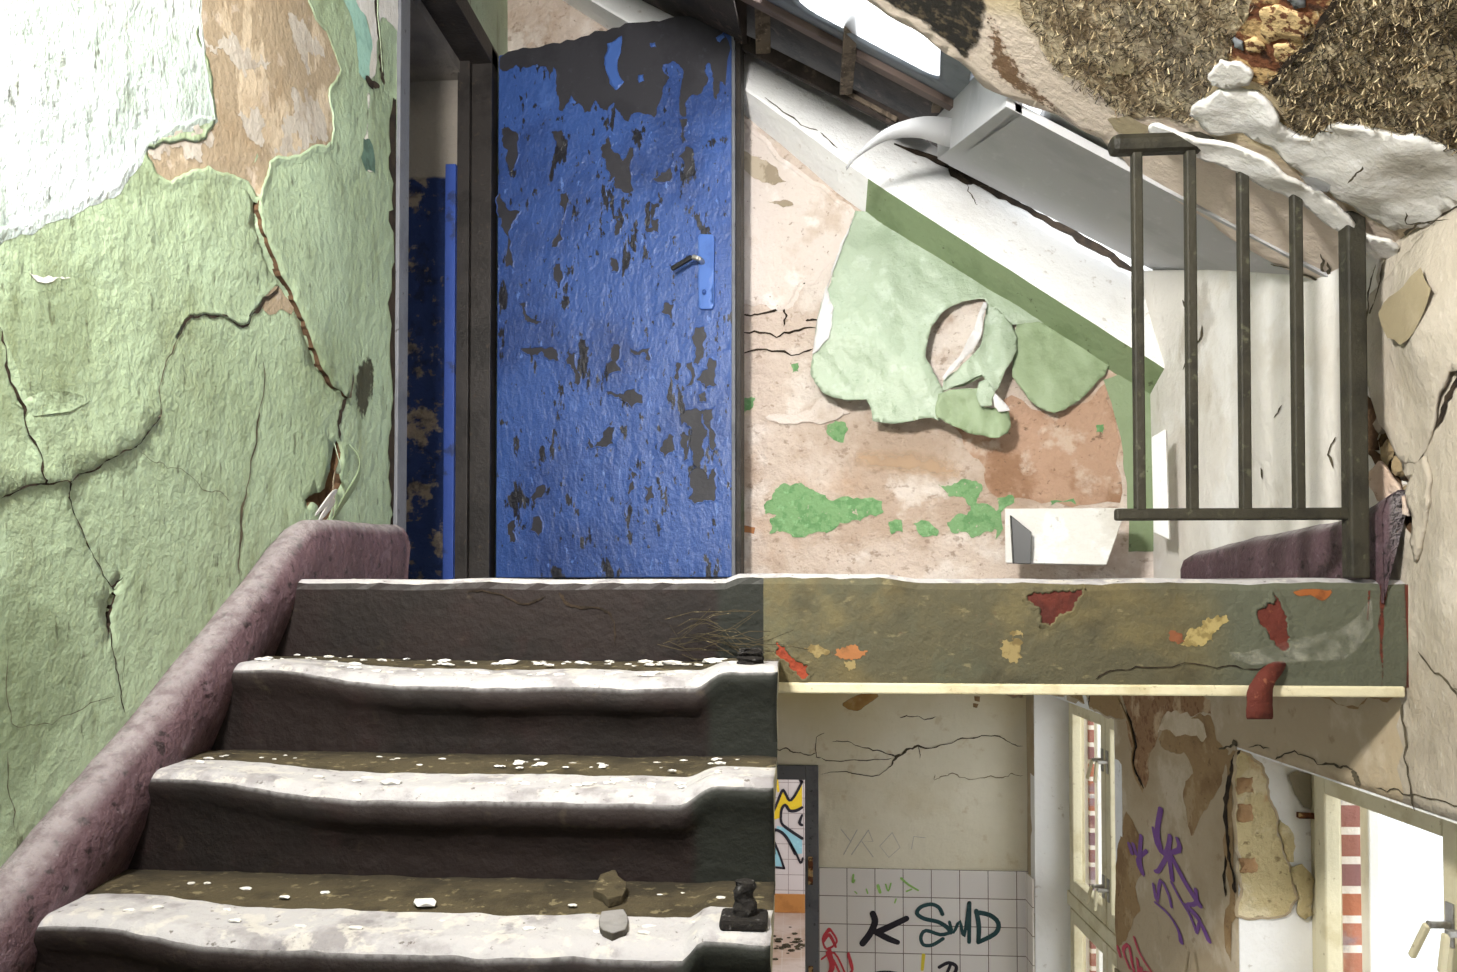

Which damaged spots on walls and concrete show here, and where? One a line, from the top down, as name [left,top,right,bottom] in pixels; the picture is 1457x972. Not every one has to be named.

peeling [0,0,398,244]
peeling [499,16,730,182]
peeling [1018,0,1457,259]
crack [0,200,354,830]
peeling [744,116,1122,538]
crack [1271,254,1331,281]
crack [1327,437,1336,467]
crack [1419,376,1457,460]
peeling [1000,584,1088,663]
crack [777,715,1023,780]
spalling [1053,695,1315,961]
crack [1219,704,1457,897]